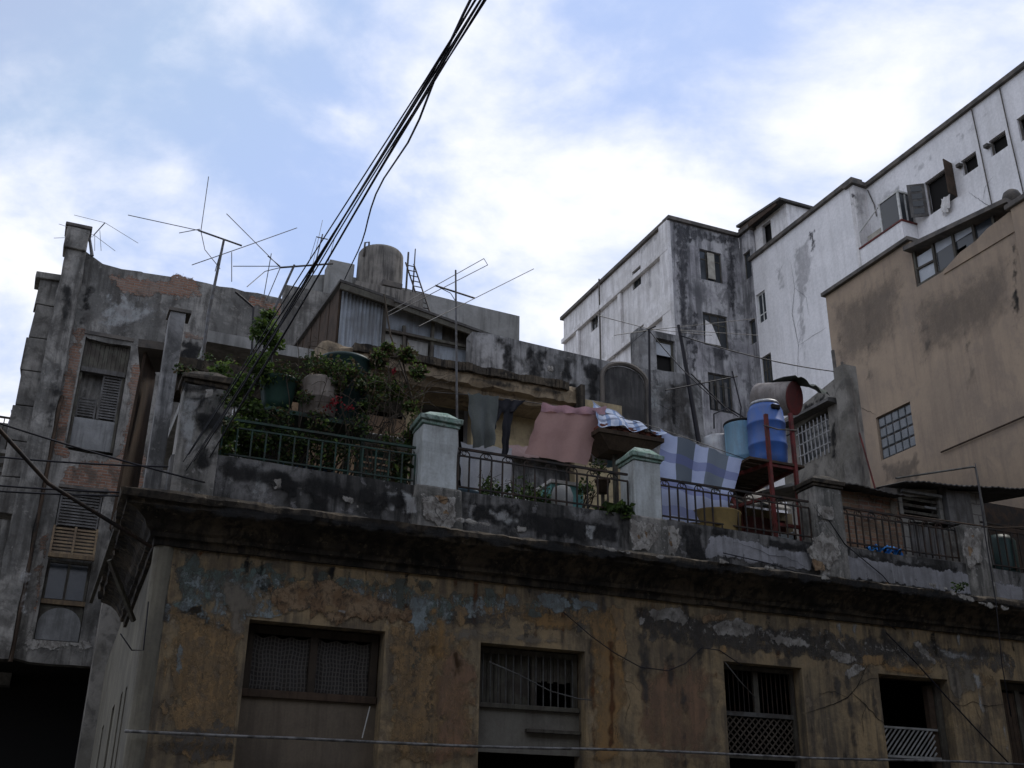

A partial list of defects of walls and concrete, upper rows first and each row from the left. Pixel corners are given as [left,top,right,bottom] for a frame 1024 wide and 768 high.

flaking render [109,274,202,301]
damp [674,225,735,370]
damp [473,338,514,387]
damp [526,347,576,394]
damp [584,363,600,401]
damp [213,460,621,559]
flaking render [404,493,490,528]
flaking render [807,532,841,580]
flaking render [916,579,1009,610]
flaking render [639,607,688,626]
flaking render [702,613,755,653]
flaking render [769,634,811,657]